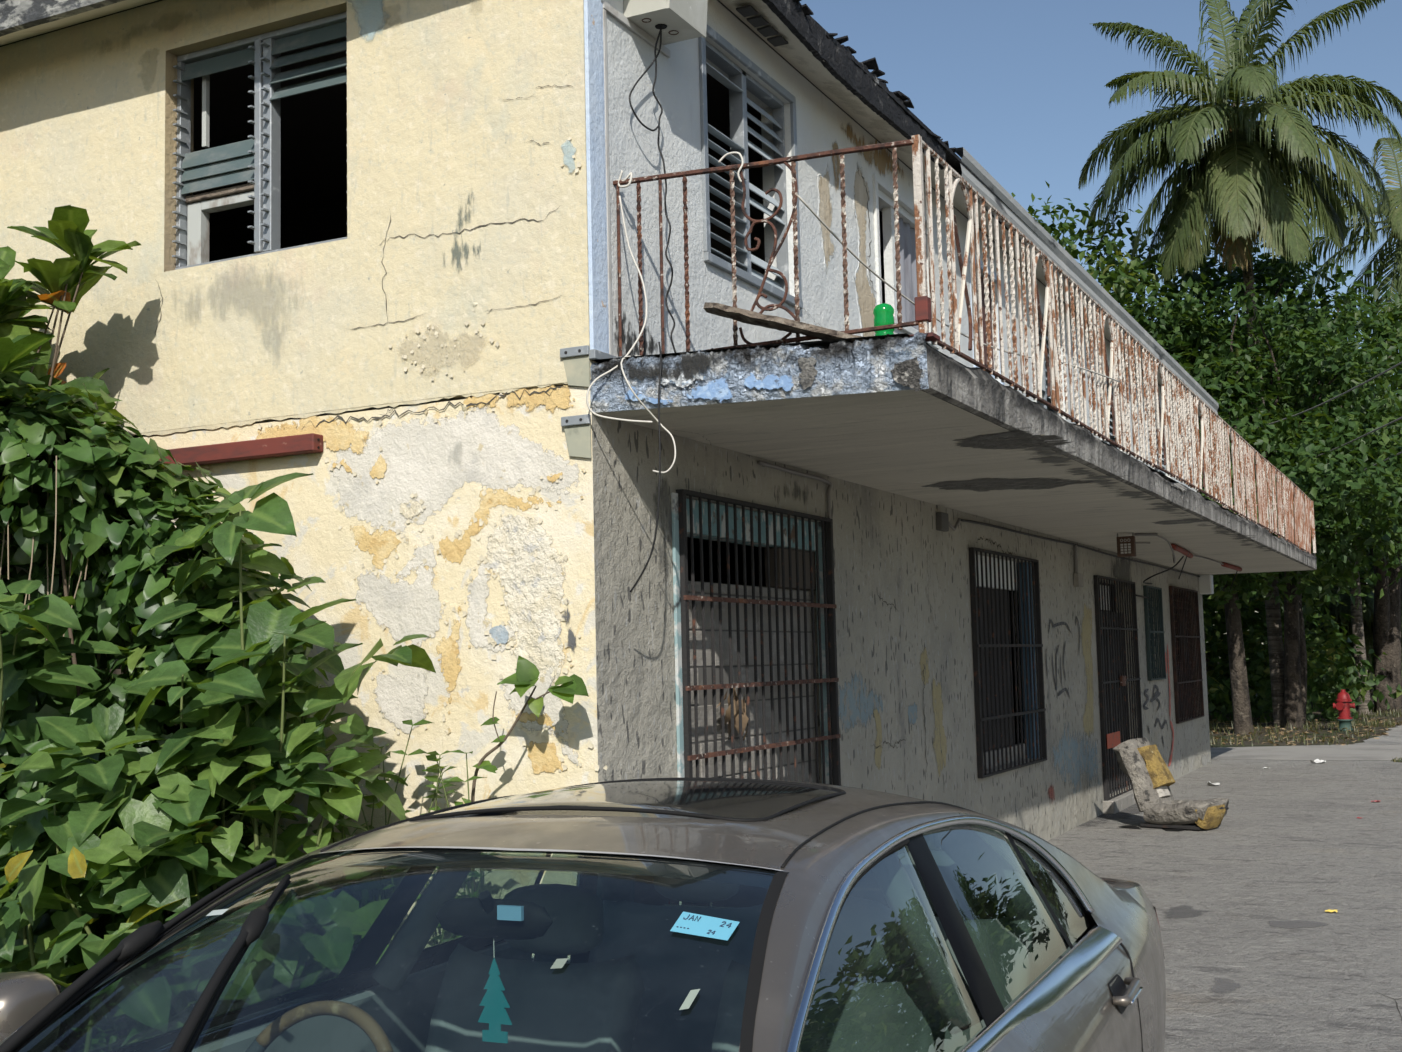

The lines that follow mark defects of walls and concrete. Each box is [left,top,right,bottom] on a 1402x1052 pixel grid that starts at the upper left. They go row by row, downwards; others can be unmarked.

peeling [351,0,388,40]
corrosion [832,142,840,188]
crack [354,206,560,329]
peeling [624,357,818,405]
spalling [891,357,923,392]
peeling [255,385,608,774]